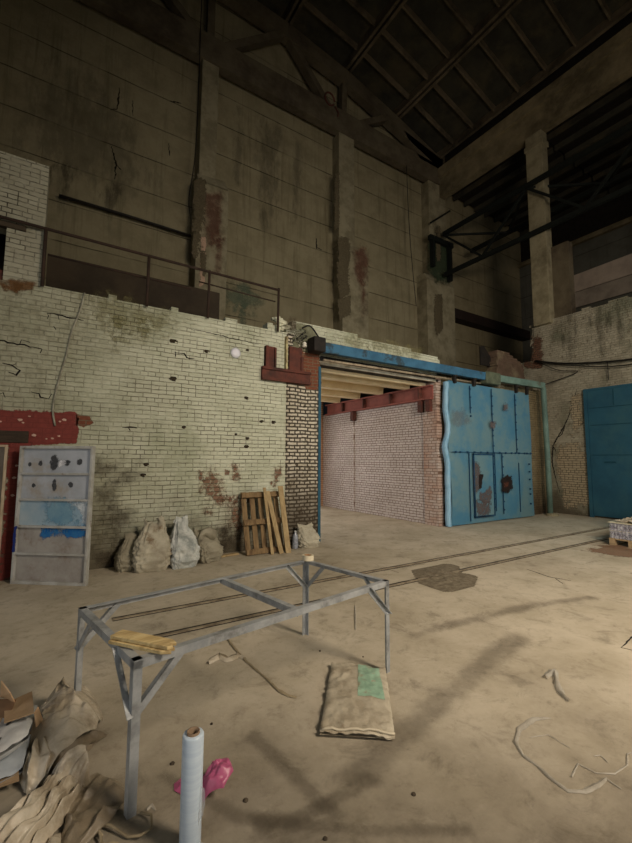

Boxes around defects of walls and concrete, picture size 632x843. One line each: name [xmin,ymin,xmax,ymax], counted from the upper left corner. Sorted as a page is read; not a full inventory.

spalling [191,178,207,287]
rust [0,279,36,293]
crack [47,313,84,330]
crack [0,340,42,376]
peeling [0,409,93,581]
flaking render [198,464,255,529]
rust [474,463,492,516]